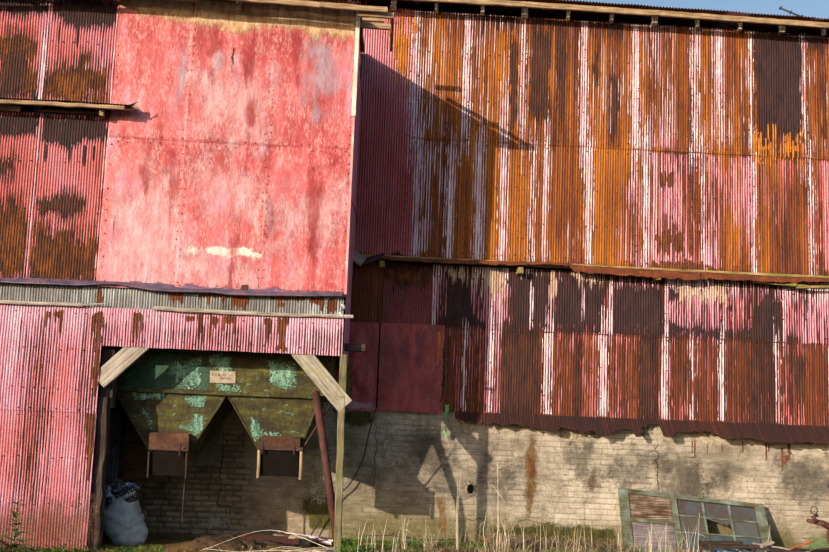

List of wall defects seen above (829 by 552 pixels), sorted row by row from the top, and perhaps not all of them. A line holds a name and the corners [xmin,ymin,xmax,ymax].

leakage [121,0,356,40]
corrosion [529,19,567,142]
corrosion [749,31,828,172]
corrosion [0,0,118,396]
peeling [183,243,262,264]
corrosion [185,285,249,346]
corrosion [264,296,337,352]
corrosion [498,270,781,415]
peeling [124,350,241,437]
peeling [266,358,297,389]
peeling [250,417,281,441]
crack [650,443,659,492]